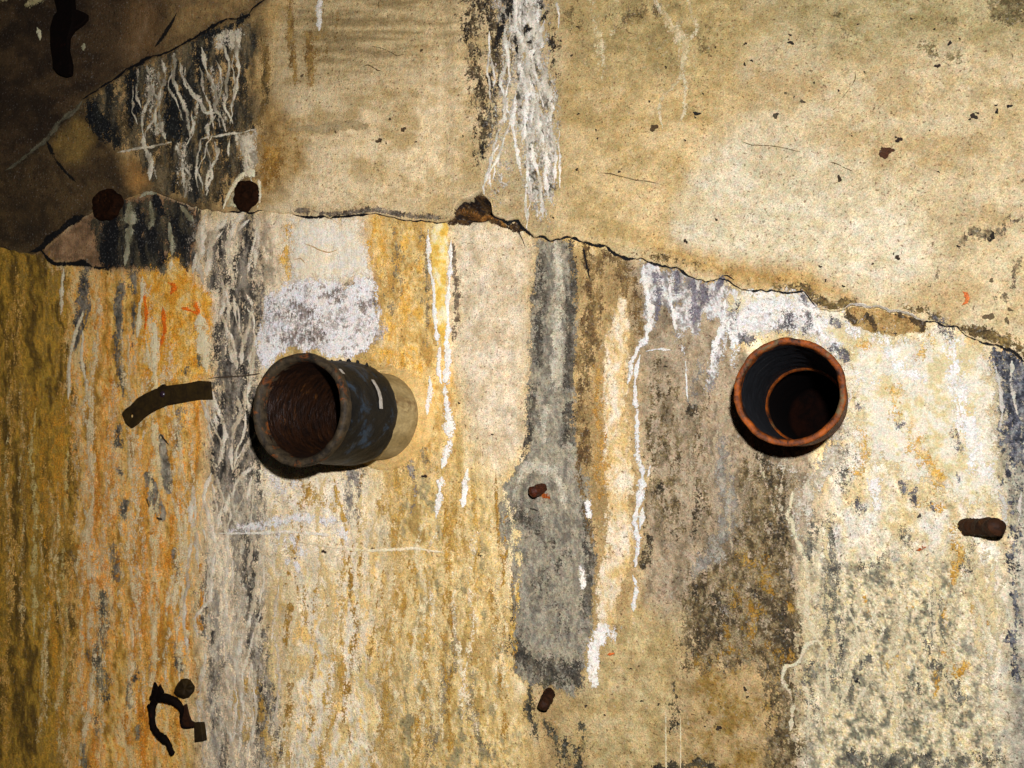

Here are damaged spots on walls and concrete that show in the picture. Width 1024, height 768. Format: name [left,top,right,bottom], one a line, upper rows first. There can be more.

crack [5,0,264,182]
crack [30,215,106,270]
leakage [59,11,461,768]
crack [296,213,448,224]
crack [491,205,817,308]
leakage [452,0,1024,768]
crack [920,321,1024,362]
rust [0,249,215,768]
leakage [419,593,496,765]